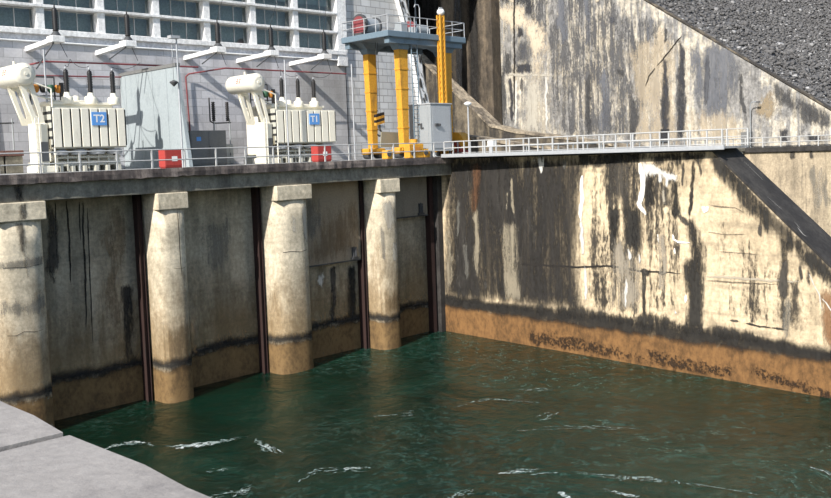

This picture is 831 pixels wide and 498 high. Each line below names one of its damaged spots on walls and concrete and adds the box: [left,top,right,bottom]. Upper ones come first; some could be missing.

damp [501,0,746,140]
crack [645,37,681,86]
damp [774,83,830,140]
damp [14,185,26,252]
damp [0,201,429,427]
damp [445,152,831,398]